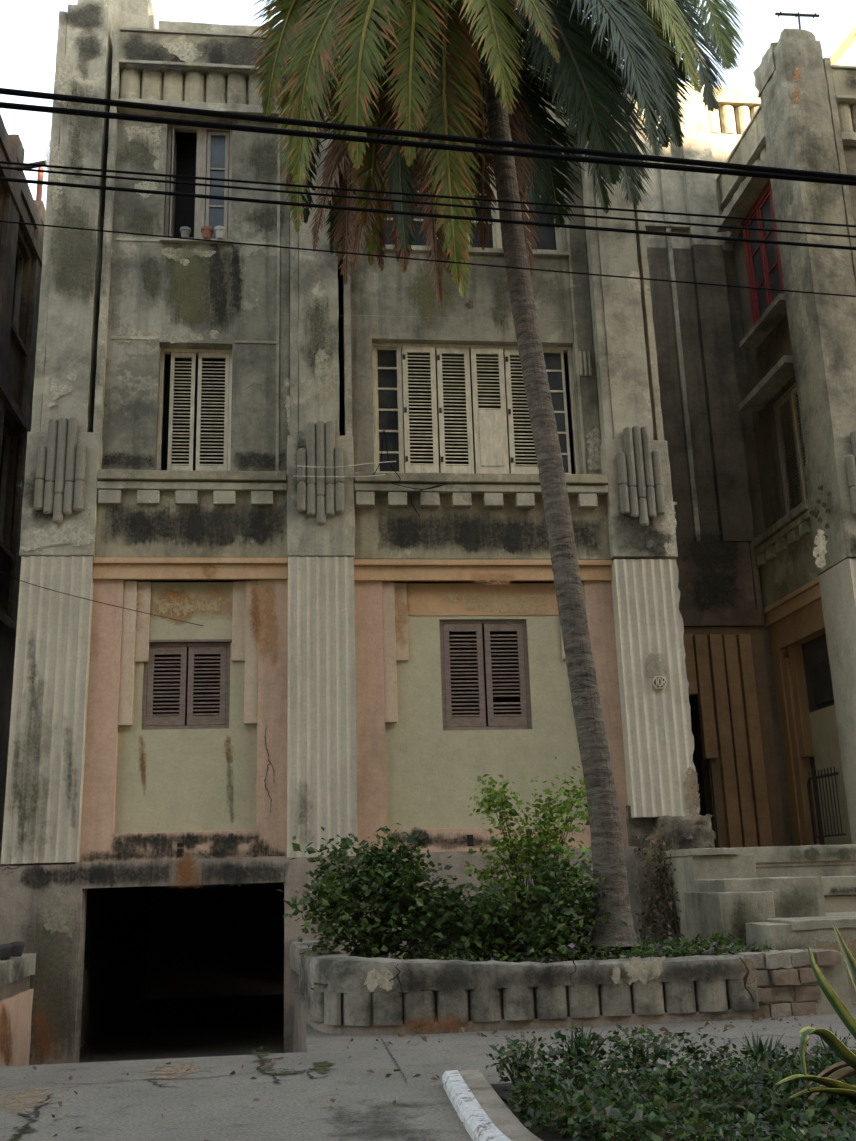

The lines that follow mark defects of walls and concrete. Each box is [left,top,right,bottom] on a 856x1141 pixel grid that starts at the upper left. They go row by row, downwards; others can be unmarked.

damp [60,4,103,177]
damp [141,244,241,329]
peeling [314,344,333,407]
damp [105,505,284,546]
damp [379,514,549,553]
damp [572,521,599,551]
crack [264,728,274,812]
damp [21,833,286,888]